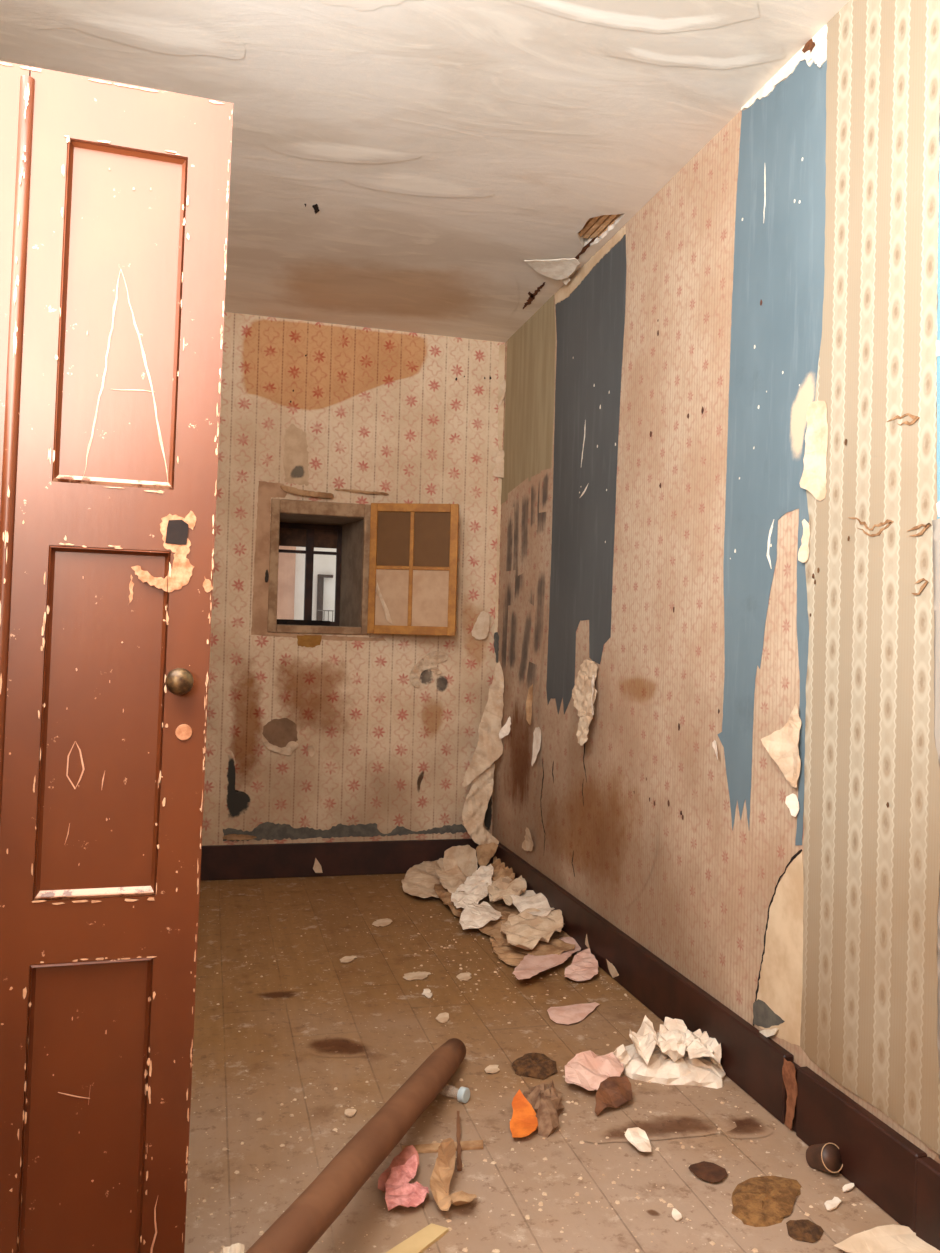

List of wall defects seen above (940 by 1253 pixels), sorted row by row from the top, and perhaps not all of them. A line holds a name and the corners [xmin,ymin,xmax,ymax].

peeling [33,6,245,59]
peeling [0,62,41,118]
water stain [235,246,519,413]
peeling [508,0,828,1046]
peeling [129,511,214,625]
peeling [262,718,314,757]
water stain [224,645,361,823]
water stain [418,669,450,744]
water stain [456,468,663,910]
peeling [223,822,467,842]
peeling [144,1047,152,1104]
peeling [782,1058,798,1130]